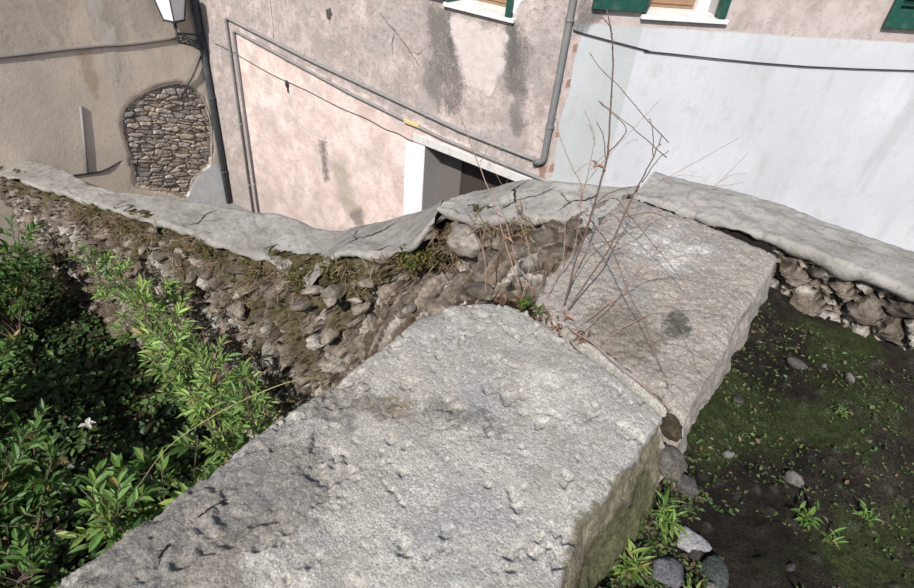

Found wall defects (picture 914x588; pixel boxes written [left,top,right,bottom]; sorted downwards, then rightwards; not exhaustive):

leakage [425,3,463,114]
leakage [504,24,529,135]
spalling [121,82,213,198]
crack [502,182,596,211]